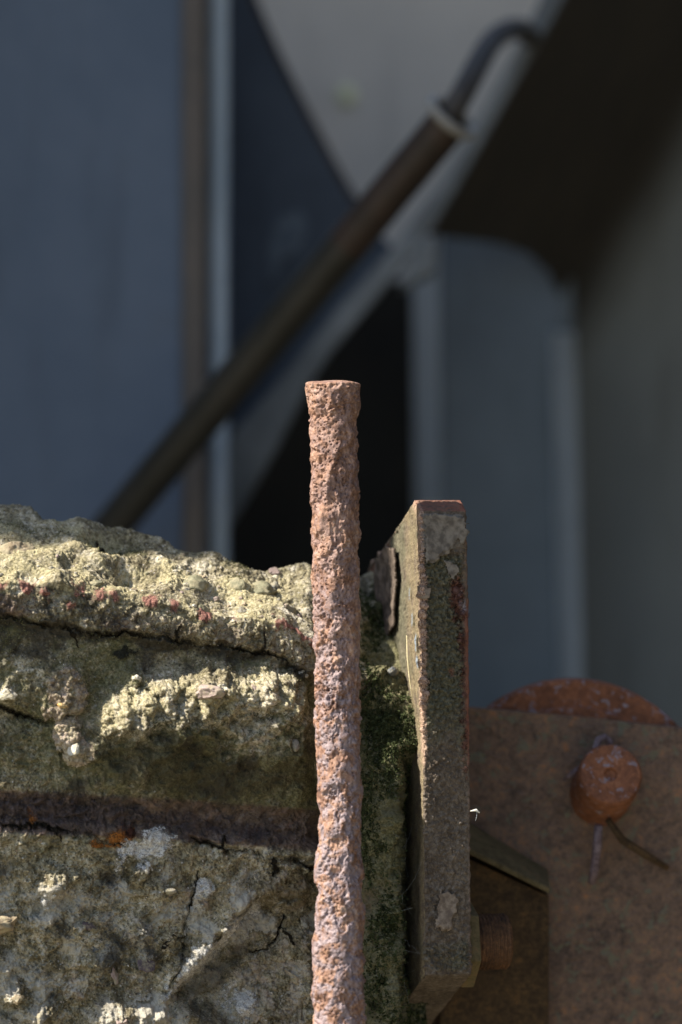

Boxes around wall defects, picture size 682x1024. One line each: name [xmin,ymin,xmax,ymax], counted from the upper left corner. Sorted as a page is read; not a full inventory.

crack [33,622,288,661]
rust [90,825,136,860]
crack [161,872,199,983]
crack [250,915,295,952]